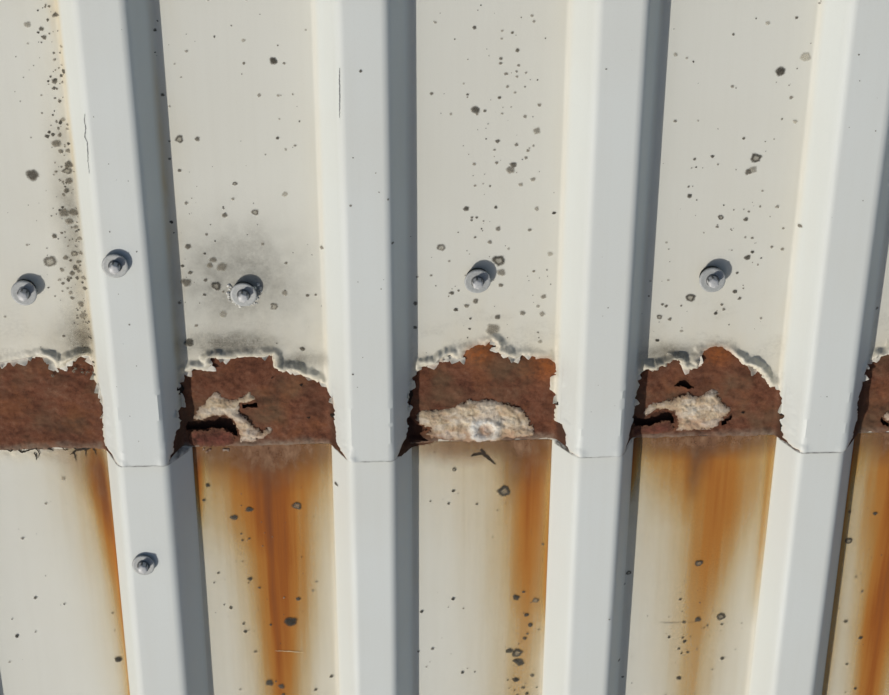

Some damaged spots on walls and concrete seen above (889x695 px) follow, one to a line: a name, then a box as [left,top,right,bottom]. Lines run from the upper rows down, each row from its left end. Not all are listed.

rust [0,339,137,695]
rust [150,338,365,695]
rust [378,323,593,693]
rust [606,331,817,695]
rust [822,333,889,695]